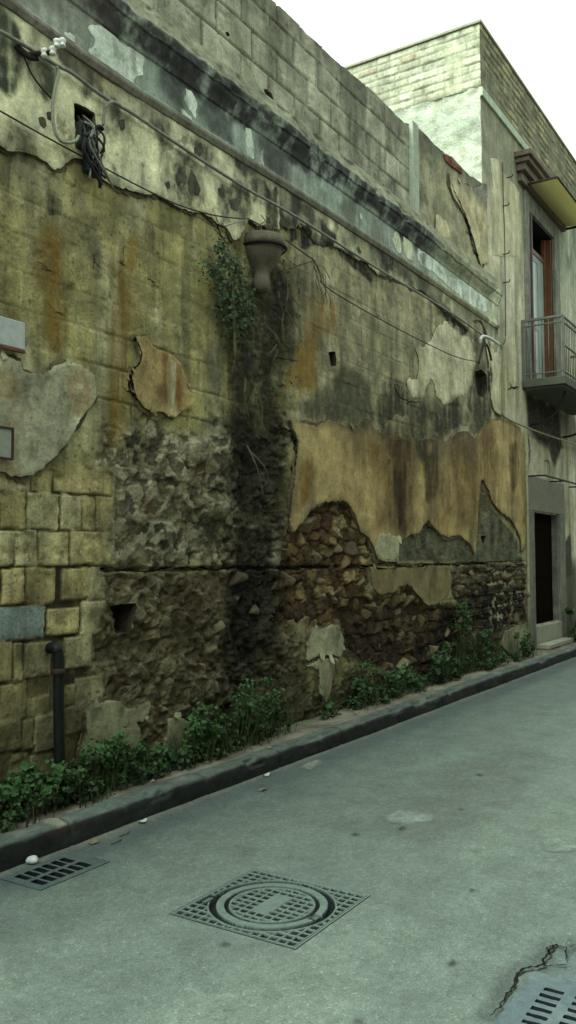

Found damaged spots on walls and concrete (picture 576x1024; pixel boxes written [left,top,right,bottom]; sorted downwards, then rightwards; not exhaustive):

water stain [112,98,121,126]
crack [450,178,479,264]
flaking render [0,4,531,657]
spalling [75,333,283,768]
water stain [213,264,295,684]
water stain [305,363,493,527]
flaking render [302,622,345,704]
crack [490,944,574,1016]